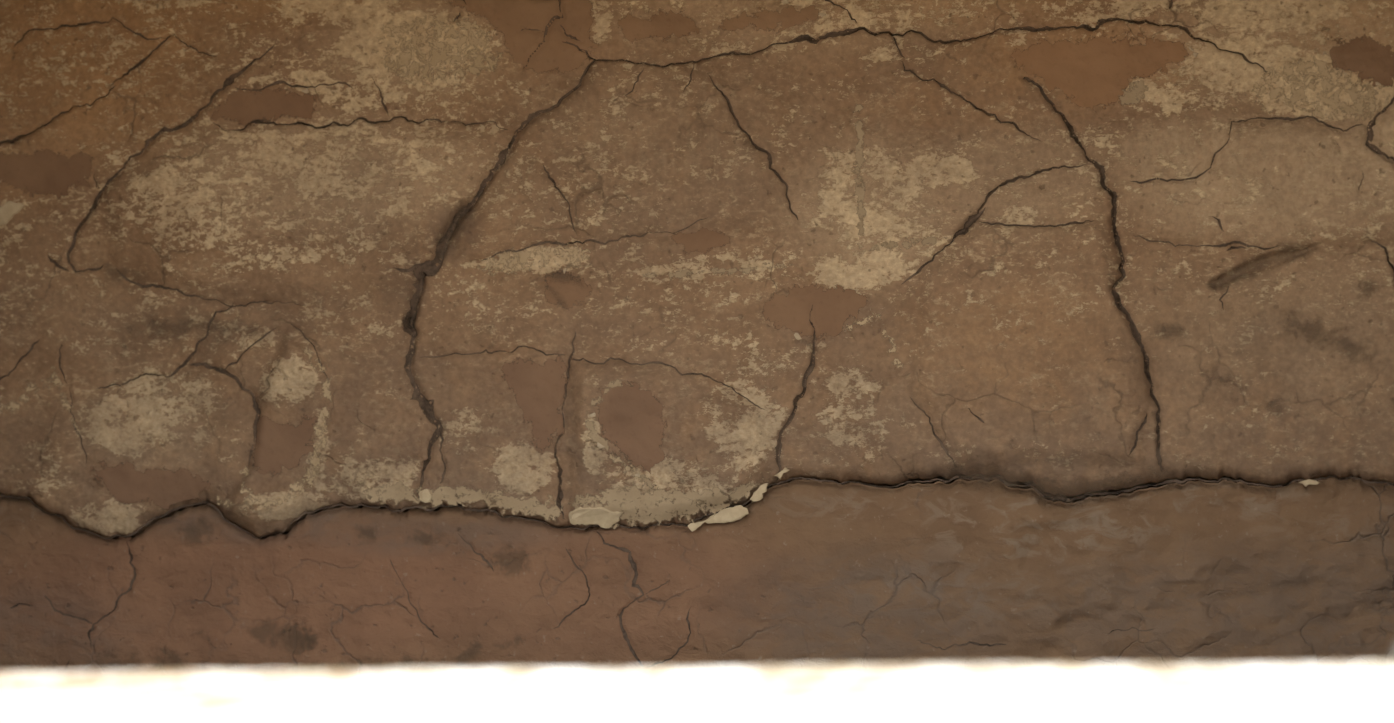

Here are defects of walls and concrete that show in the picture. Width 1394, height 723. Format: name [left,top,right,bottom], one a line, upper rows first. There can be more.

crack [0,17,217,144]
crack [48,45,354,466]
crack [214,0,1267,494]
crack [767,77,1394,502]
crack [0,332,763,668]
peeling [688,468,789,532]
crack [920,640,1006,650]